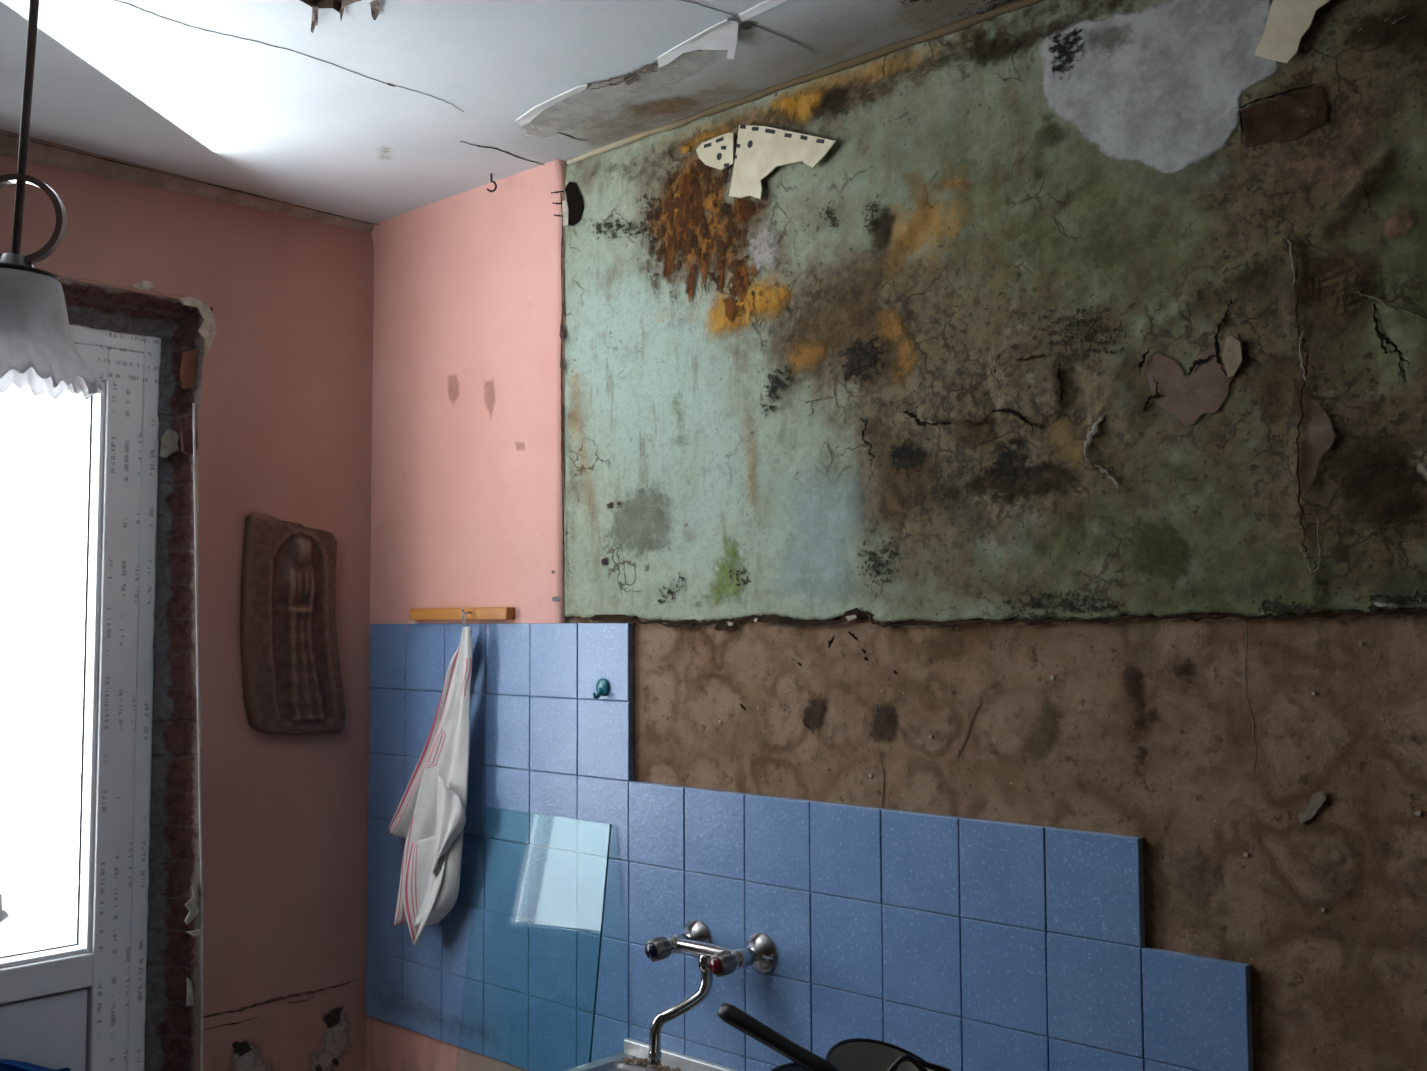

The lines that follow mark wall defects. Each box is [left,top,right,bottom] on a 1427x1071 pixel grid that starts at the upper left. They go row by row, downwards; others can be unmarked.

crack [114,0,589,165]
peeling [515,0,788,137]
flaking render [1033,0,1327,184]
leakage [708,195,908,416]
leakage [1296,247,1374,329]
crack [1355,291,1427,386]
crack [903,408,1034,446]
leakage [601,488,668,565]
leakage [857,424,931,588]
spalling [0,246,229,1071]
peeling [590,588,1427,661]
crack [200,977,366,1030]